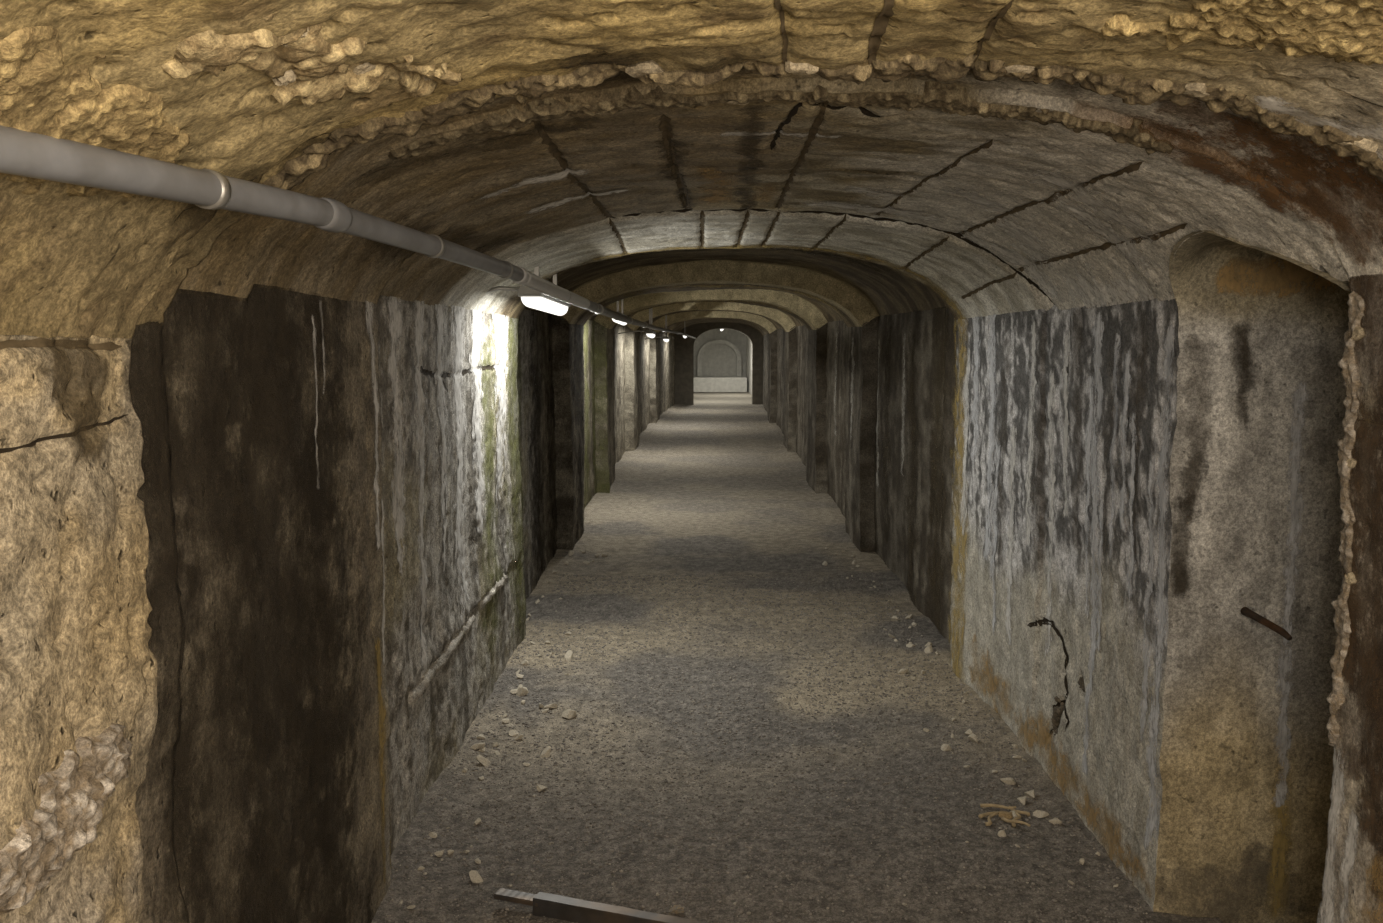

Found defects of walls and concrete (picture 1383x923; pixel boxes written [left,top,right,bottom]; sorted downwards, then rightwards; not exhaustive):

damp [546,53,646,85]
crack [867,0,894,65]
crack [531,101,1187,305]
rust [1139,100,1383,328]
crack [0,415,126,453]
damp [128,284,508,923]
rust [793,247,966,482]
rust [949,511,1143,879]
crack [1027,617,1069,735]
damp [944,170,1203,848]
damp [1234,326,1252,420]
rust [1336,367,1383,902]